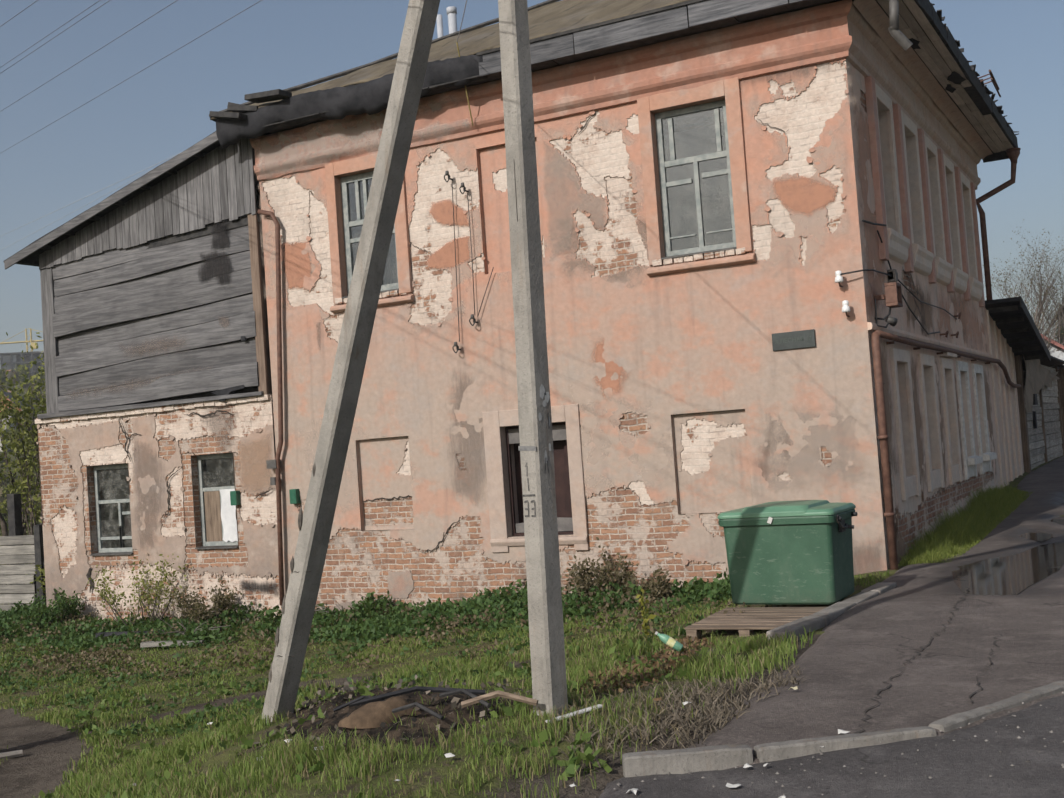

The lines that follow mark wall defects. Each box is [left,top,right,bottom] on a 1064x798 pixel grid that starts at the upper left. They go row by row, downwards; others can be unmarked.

flaking render [258,113,385,343]
flaking render [408,148,480,326]
flaking render [492,168,507,193]
flaking render [549,110,650,278]
flaking render [752,198,808,266]
flaking render [754,60,867,233]
crack [118,419,141,462]
flaking render [36,395,287,647]
flaking render [314,497,527,612]
flaking render [559,480,728,594]
flaking render [678,418,747,476]
crack [854,577,970,734]